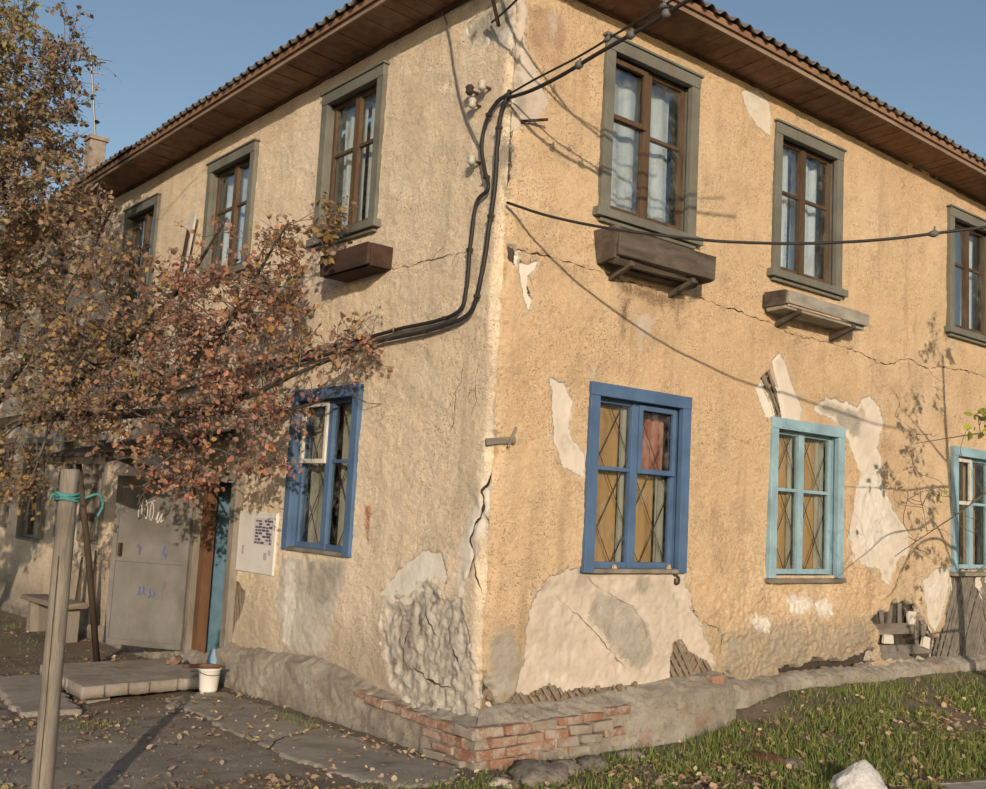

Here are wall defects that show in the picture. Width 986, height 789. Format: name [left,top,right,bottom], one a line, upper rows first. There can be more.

peeling [462,0,548,132]
peeling [742,90,771,134]
spalling [507,246,537,309]
peeling [550,378,584,476]
crack [507,245,984,465]
peeling [755,381,775,418]
crack [469,472,492,591]
peeling [814,396,910,584]
flaking render [353,542,631,771]
flaking render [515,564,714,695]
peeling [923,567,952,633]